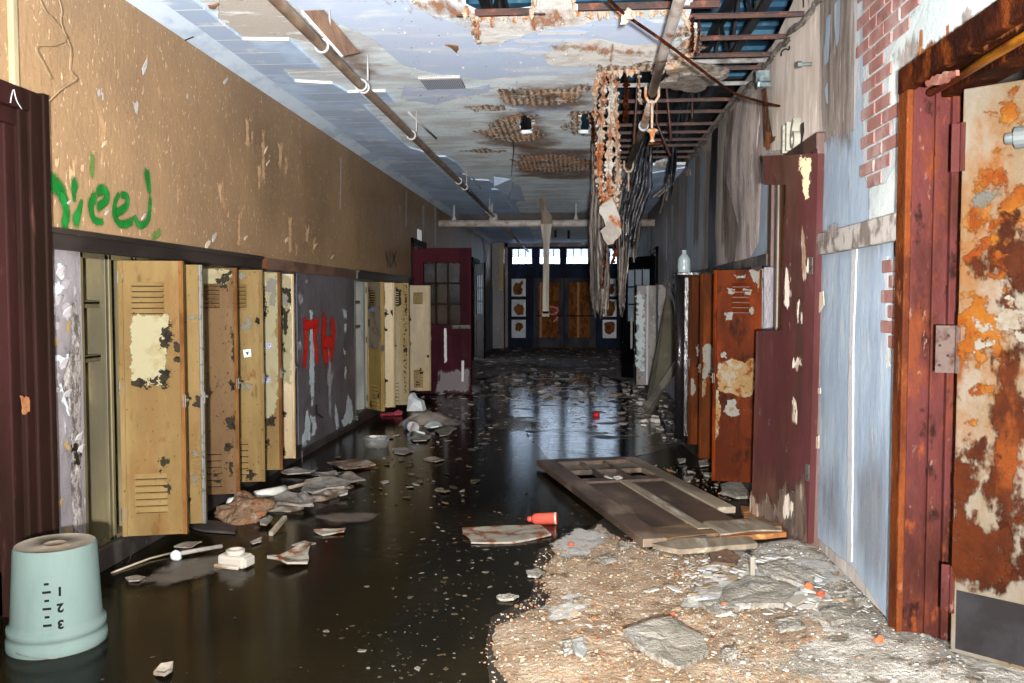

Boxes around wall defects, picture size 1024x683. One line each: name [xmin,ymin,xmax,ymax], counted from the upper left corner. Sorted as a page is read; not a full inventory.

spalling [463,0,537,23]
spalling [571,0,668,21]
spalling [678,10,698,65]
flaking render [856,0,920,188]
rust [984,86,1024,126]
leakage [721,111,738,263]
peeling [798,157,811,200]
peeling [159,321,176,349]
spalling [53,263,86,533]
peeling [131,369,178,390]
rust [952,166,1024,595]